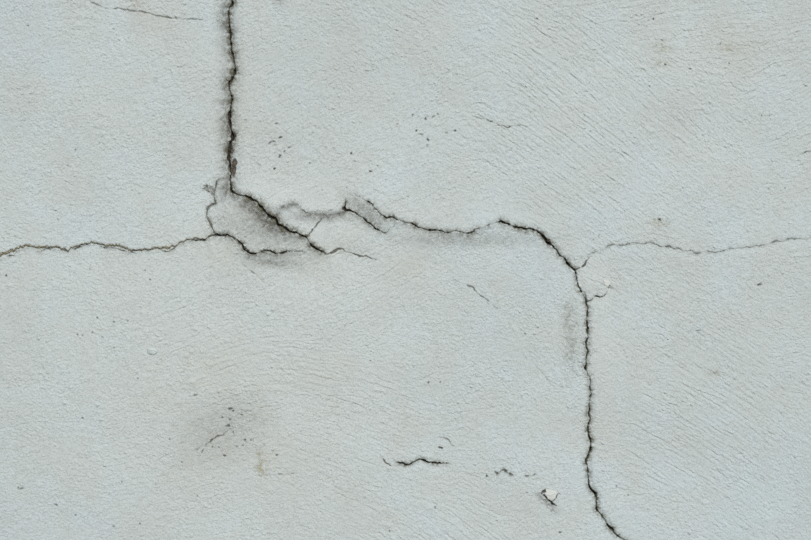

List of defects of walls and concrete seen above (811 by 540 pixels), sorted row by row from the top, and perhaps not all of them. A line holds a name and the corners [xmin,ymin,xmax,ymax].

crack [206,0,479,259]
crack [383,458,441,466]
crack [499,220,624,540]